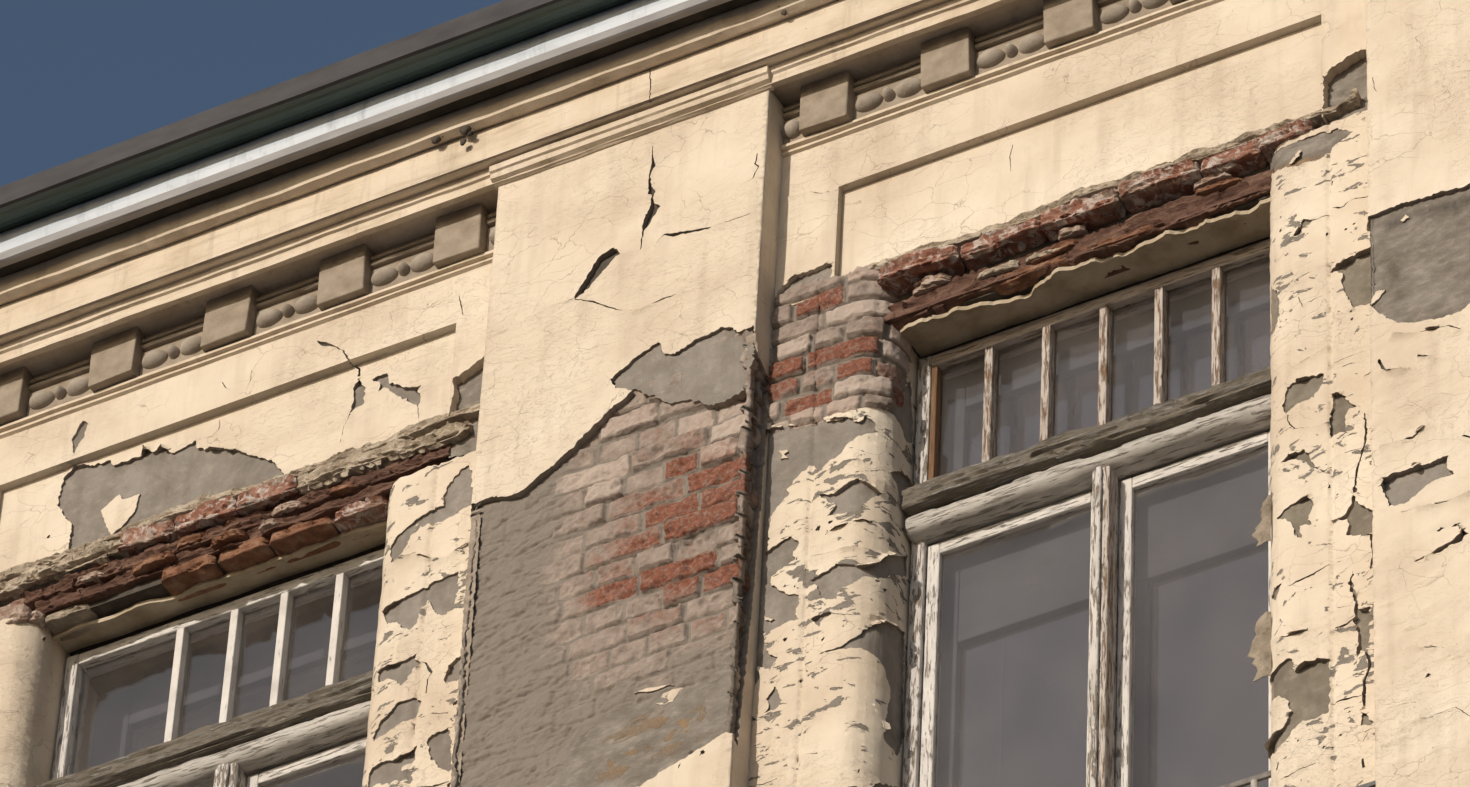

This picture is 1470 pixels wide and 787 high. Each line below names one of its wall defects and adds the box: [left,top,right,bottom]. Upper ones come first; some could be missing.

crack [645,158,687,237]
crack [581,252,620,308]
peeling [1335,188,1470,323]
crack [1380,362,1400,370]
peeling [1284,375,1355,437]
peeling [59,423,284,549]
flaking render [370,264,912,787]
peeling [1252,493,1314,547]
peeling [1330,500,1373,537]
peeling [1377,461,1453,506]
peeling [1247,586,1331,754]
crack [1355,618,1371,705]